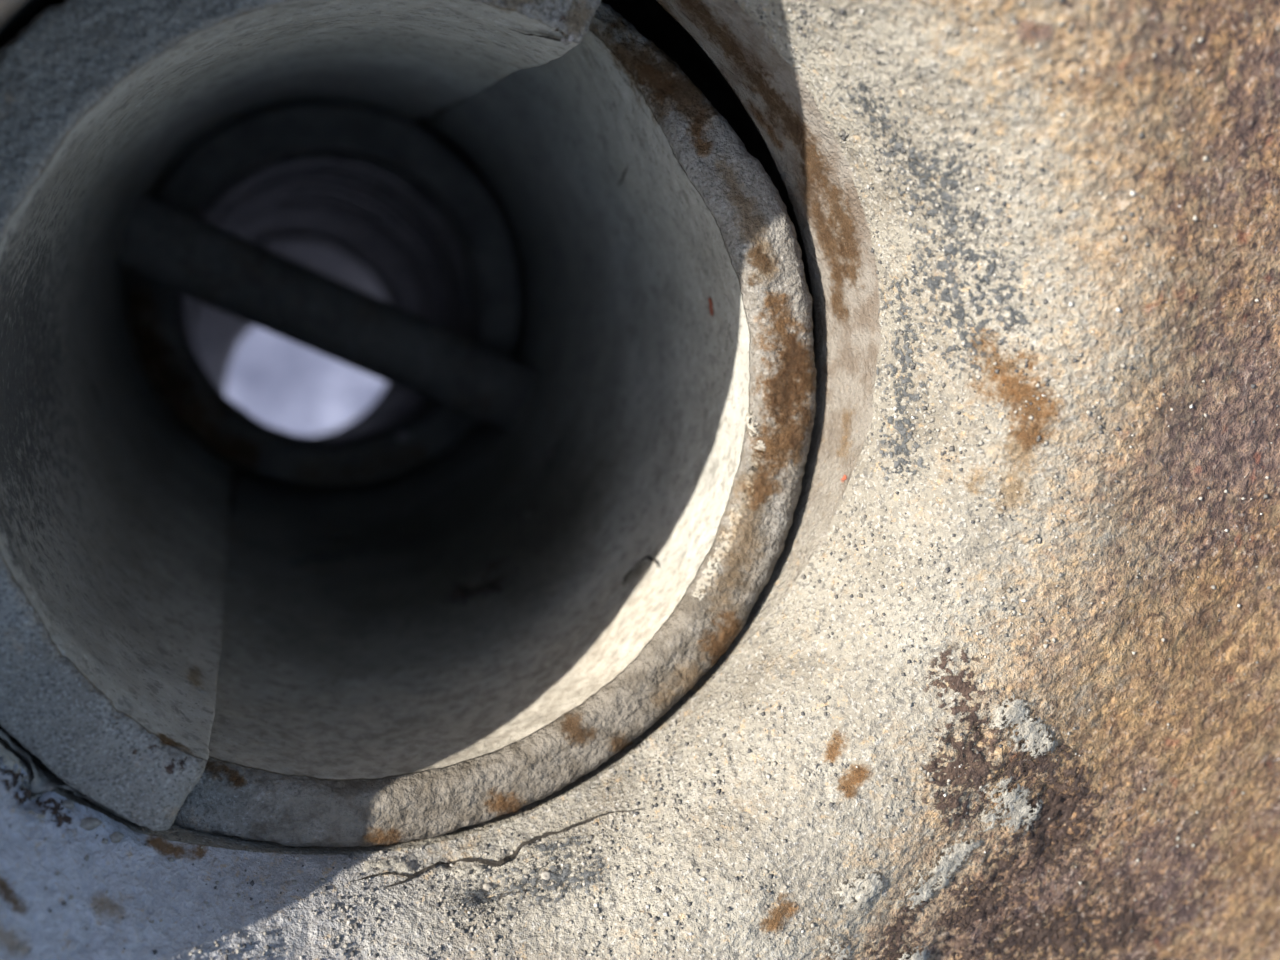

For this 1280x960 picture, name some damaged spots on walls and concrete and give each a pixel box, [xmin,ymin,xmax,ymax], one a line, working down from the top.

corrosion [680,0,857,315]
crack [350,808,643,919]